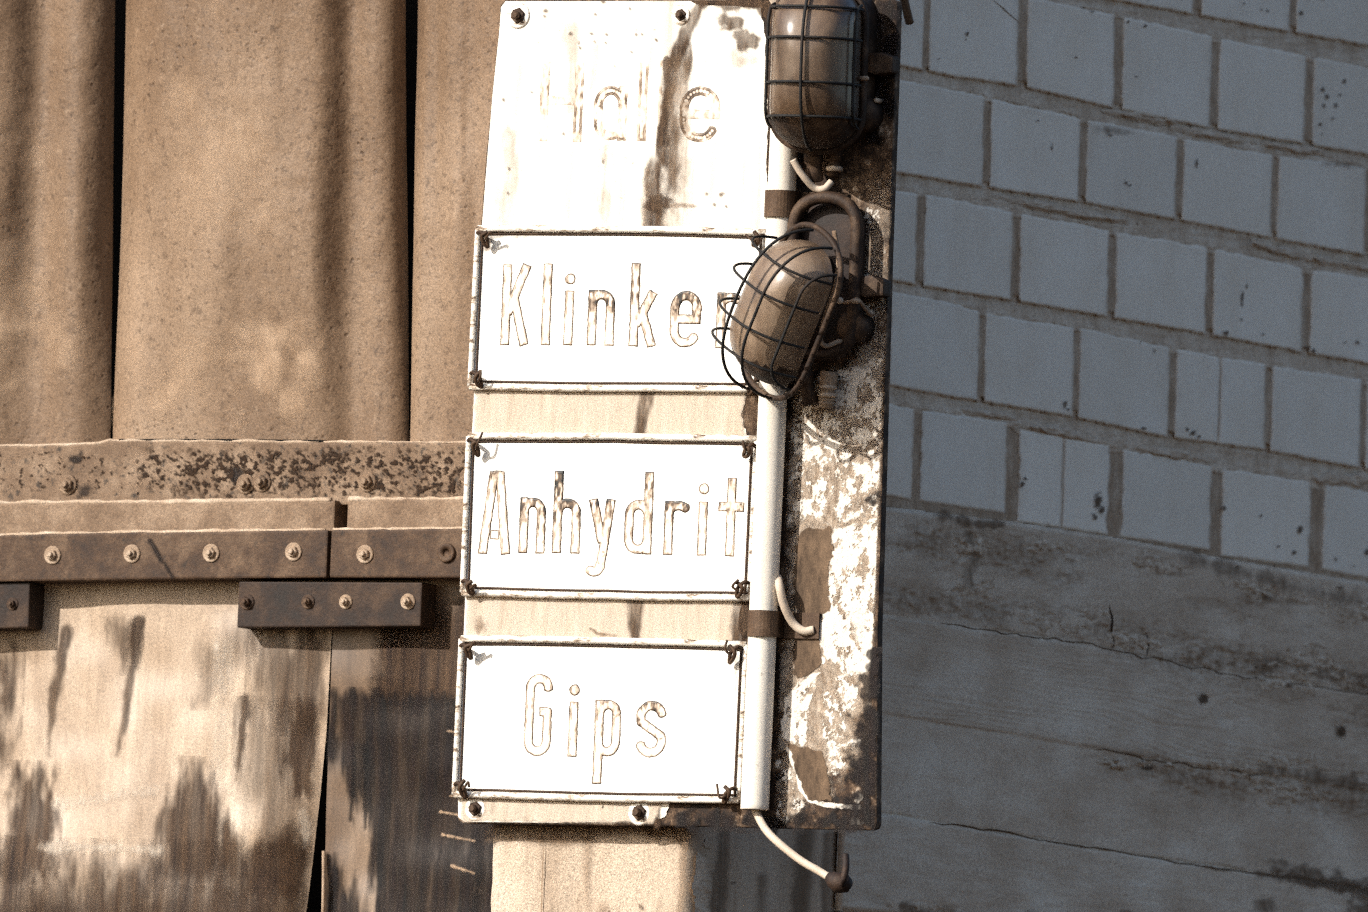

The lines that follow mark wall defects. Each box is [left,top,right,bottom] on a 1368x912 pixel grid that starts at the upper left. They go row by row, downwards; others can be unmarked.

corrosion [643,0,771,226]
corrosion [474,390,757,435]
corrosion [0,446,465,498]
peeling [775,335,885,820]
damp [1257,861,1368,912]